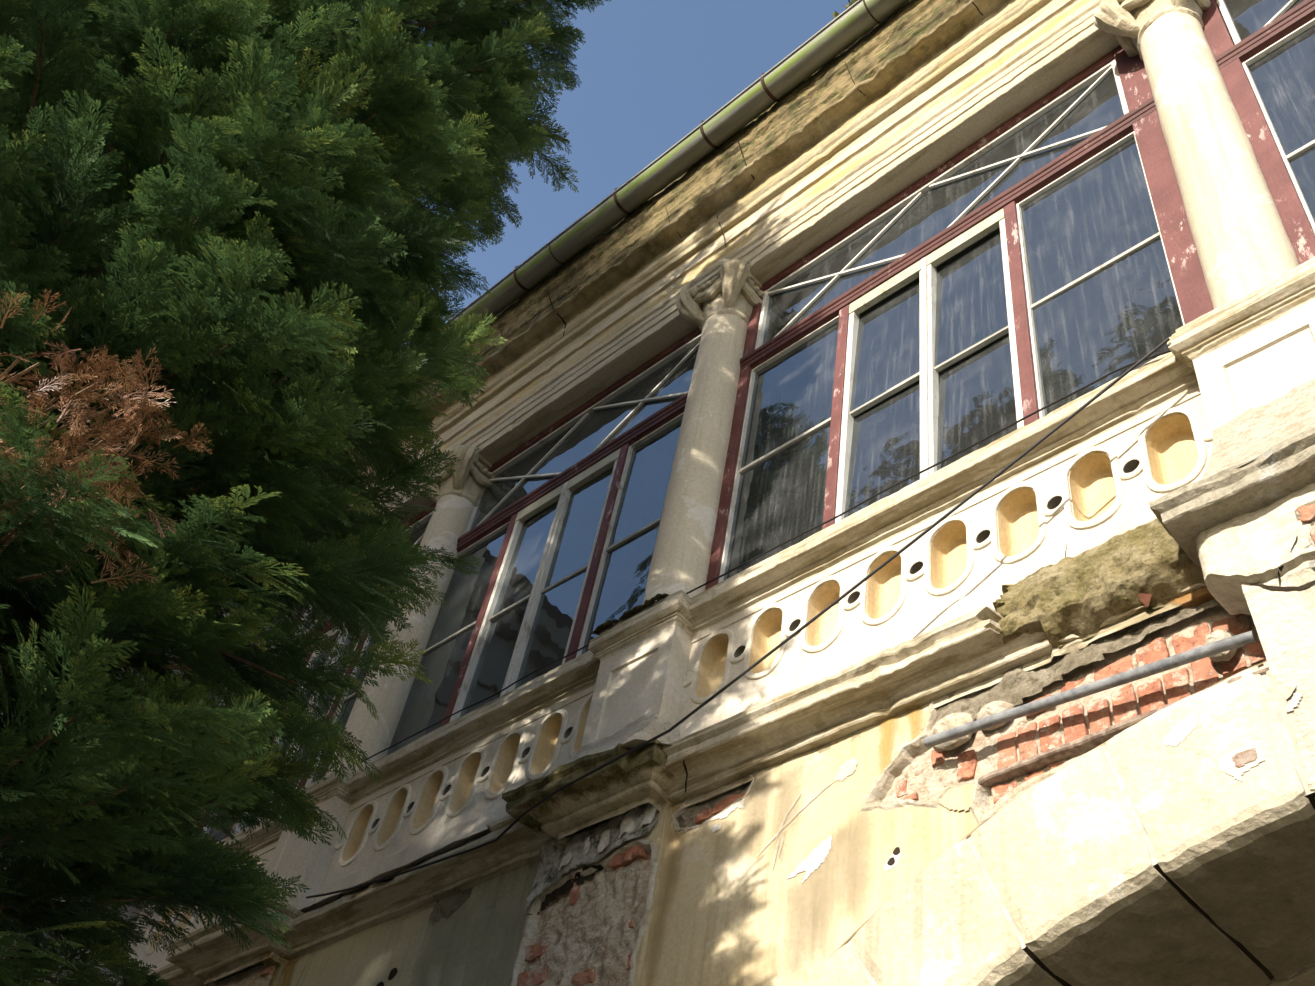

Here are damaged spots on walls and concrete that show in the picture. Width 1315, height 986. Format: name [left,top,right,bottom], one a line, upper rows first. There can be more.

flaking render [1290,500,1315,572]
crack [1250,566,1315,591]
damp [883,719,892,768]
flaking render [860,599,1270,825]
flaking render [509,774,756,986]